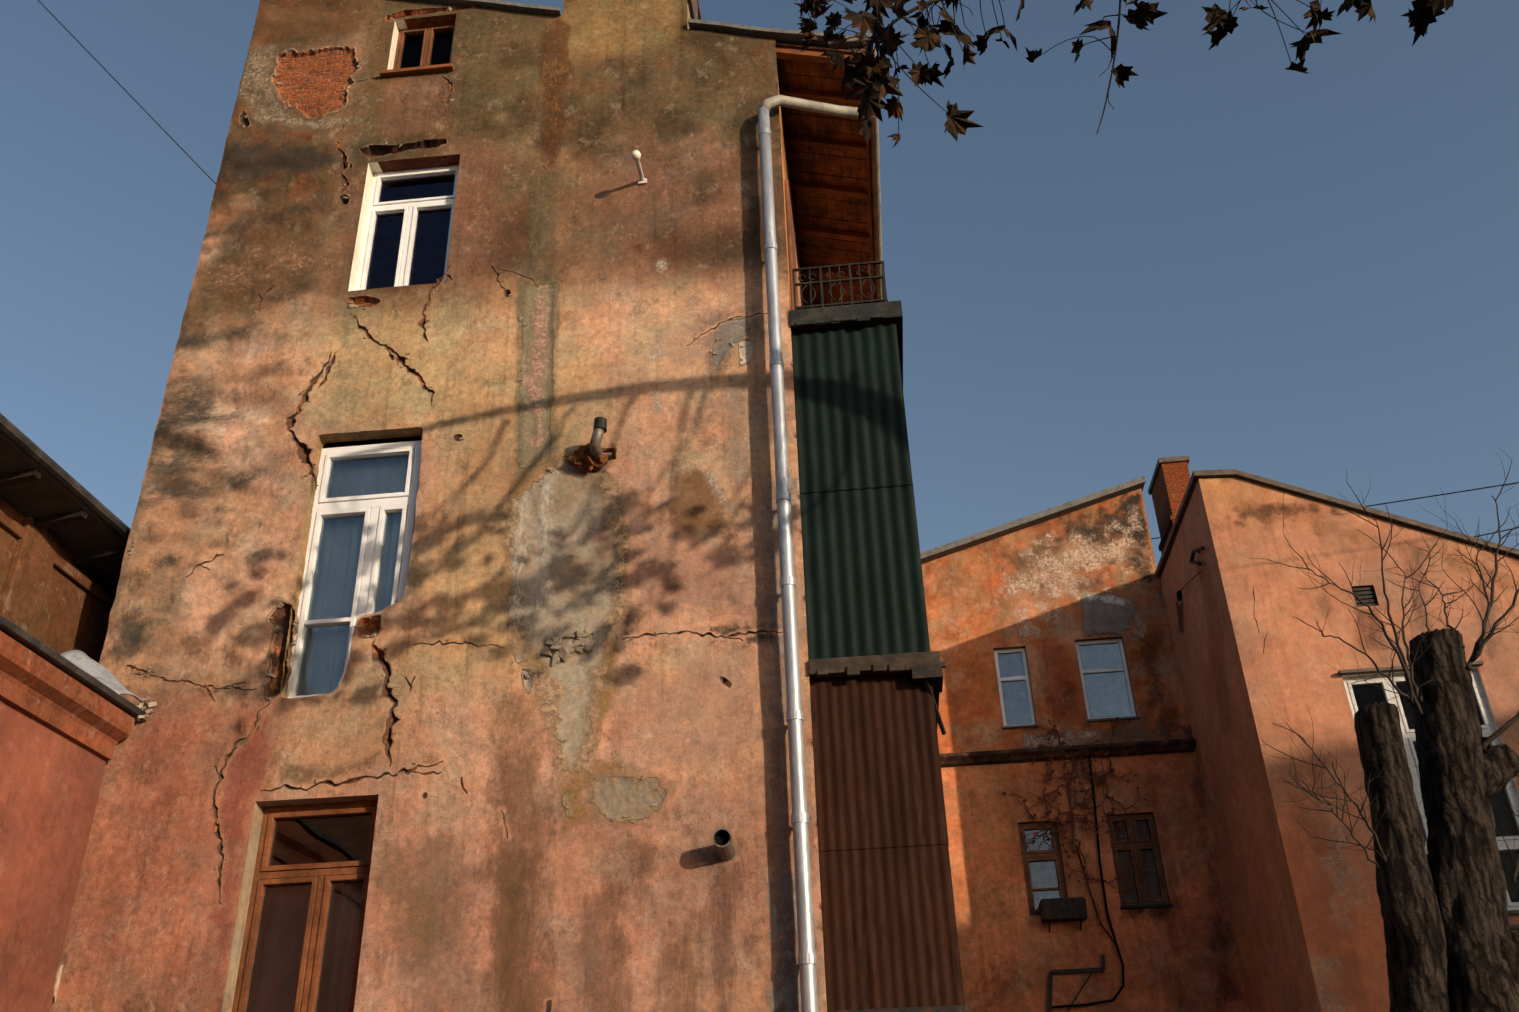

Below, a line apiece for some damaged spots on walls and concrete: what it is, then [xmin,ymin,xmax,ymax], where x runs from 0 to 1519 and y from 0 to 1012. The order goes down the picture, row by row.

spalling [238,45,362,129]
crack [336,124,353,197]
crack [285,265,454,490]
leakage [149,379,214,503]
spalling [262,599,300,702]
peeling [508,455,668,823]
crack [623,628,783,642]
peeling [1002,512,1146,638]
crack [260,638,505,794]
crack [127,663,271,905]